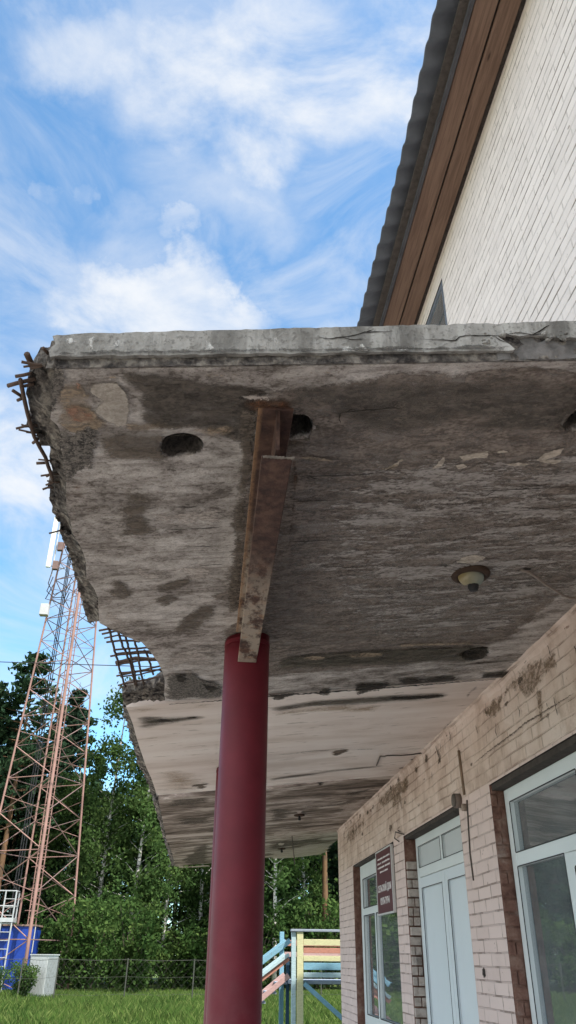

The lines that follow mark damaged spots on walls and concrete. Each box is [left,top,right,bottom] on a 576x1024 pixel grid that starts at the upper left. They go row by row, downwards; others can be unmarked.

crack [321,329,390,340]
crack [427,325,549,343]
corrosion [228,395,291,613]
leakage [100,367,576,717]
leakage [87,556,131,599]
spalling [7,331,576,868]
leakage [381,777,408,808]